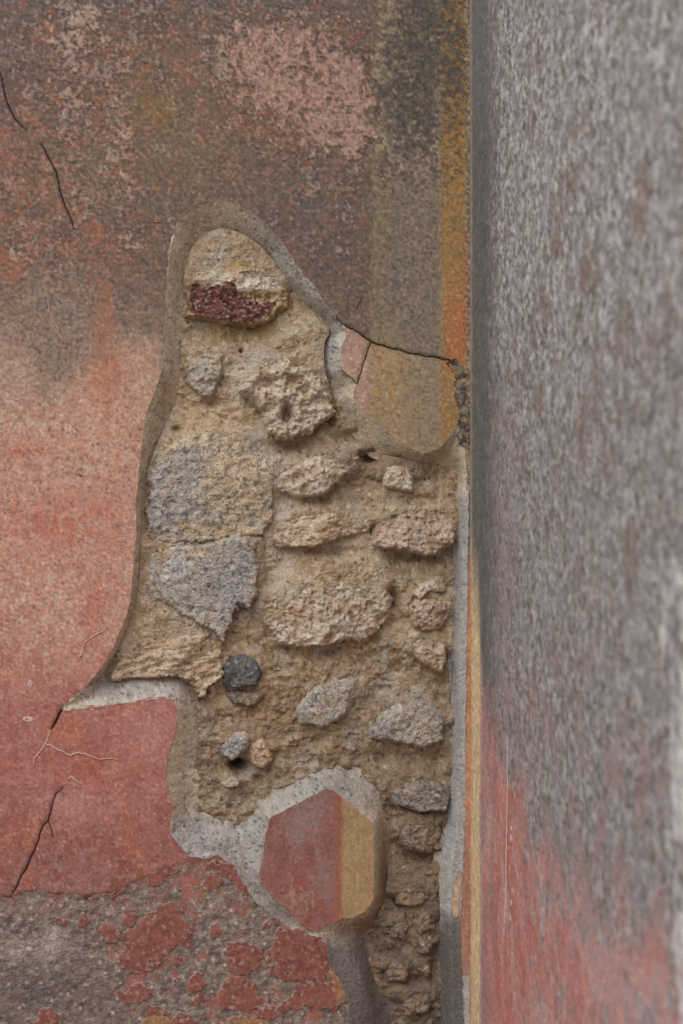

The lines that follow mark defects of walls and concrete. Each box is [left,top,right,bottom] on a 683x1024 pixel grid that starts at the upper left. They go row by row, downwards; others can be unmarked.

crack [0,73,74,230]
crack [332,291,454,384]
spalling [0,199,470,1024]
crack [33,707,117,766]
crack [12,787,63,893]